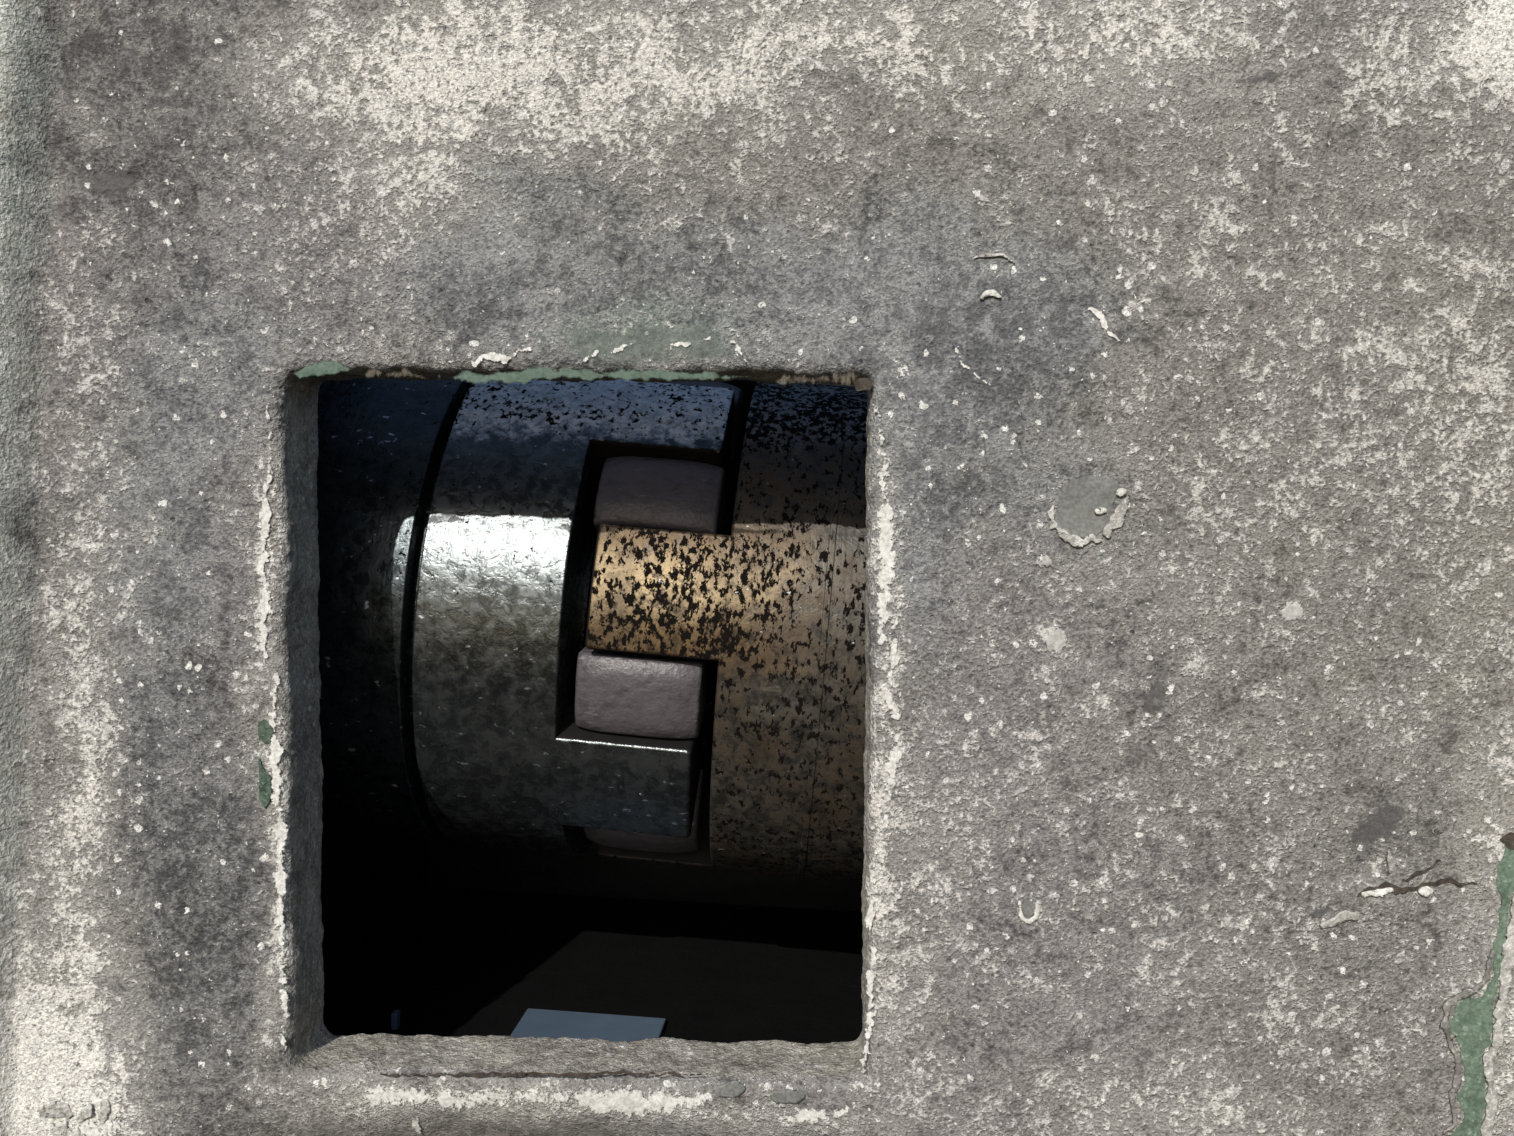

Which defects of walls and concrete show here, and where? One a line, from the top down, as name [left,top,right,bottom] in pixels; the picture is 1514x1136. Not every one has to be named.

peeling [1047,475,1129,548]
crack [1300,851,1486,929]
peeling [1439,832,1514,1136]